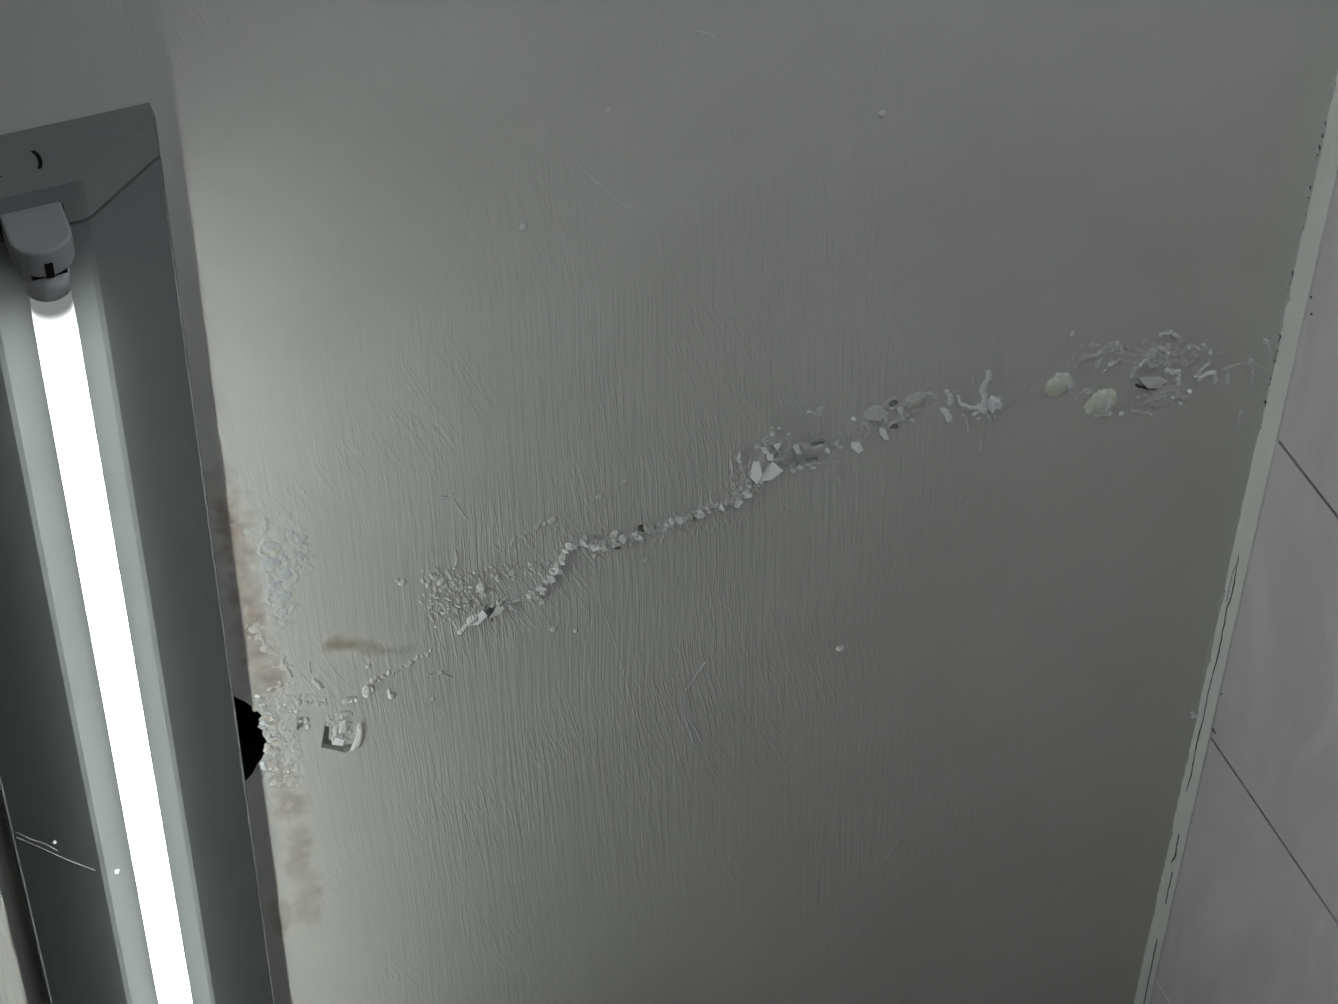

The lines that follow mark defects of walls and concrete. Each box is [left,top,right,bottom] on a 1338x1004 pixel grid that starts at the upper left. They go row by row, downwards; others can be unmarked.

damp [242,511,318,631]
peeling [417,522,571,635]
crack [521,479,760,605]
flaking render [252,679,364,791]